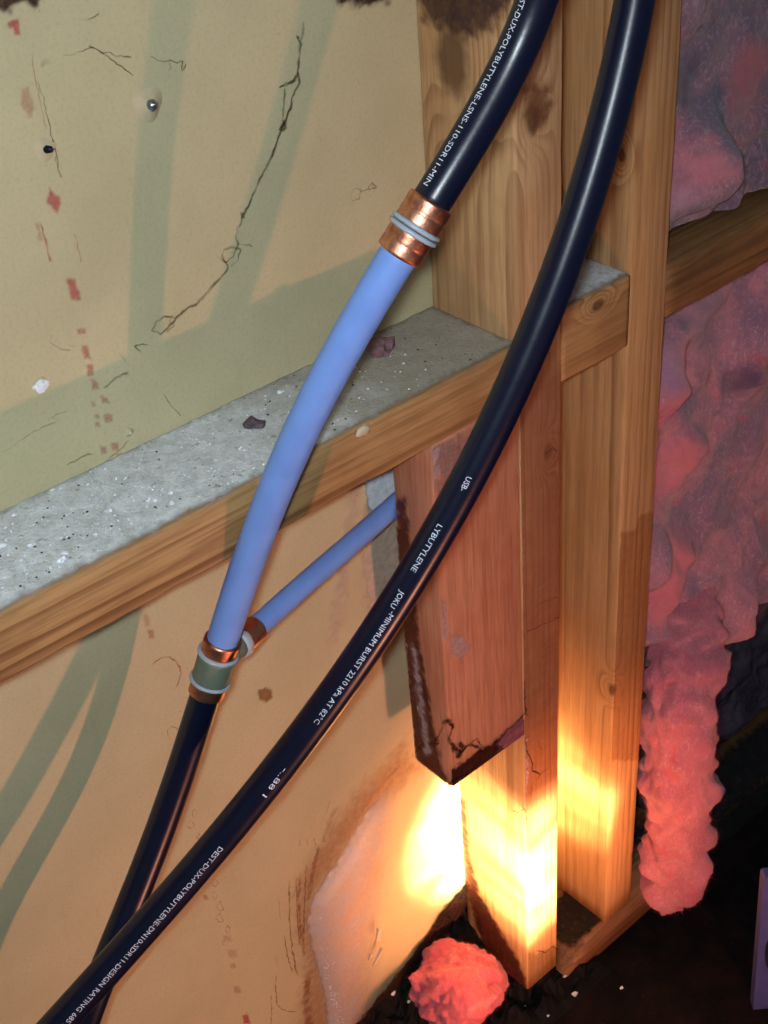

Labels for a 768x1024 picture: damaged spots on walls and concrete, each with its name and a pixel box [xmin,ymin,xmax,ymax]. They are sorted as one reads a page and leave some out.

crack [92,47,132,75]
damp [525,84,552,131]
crack [135,36,302,350]